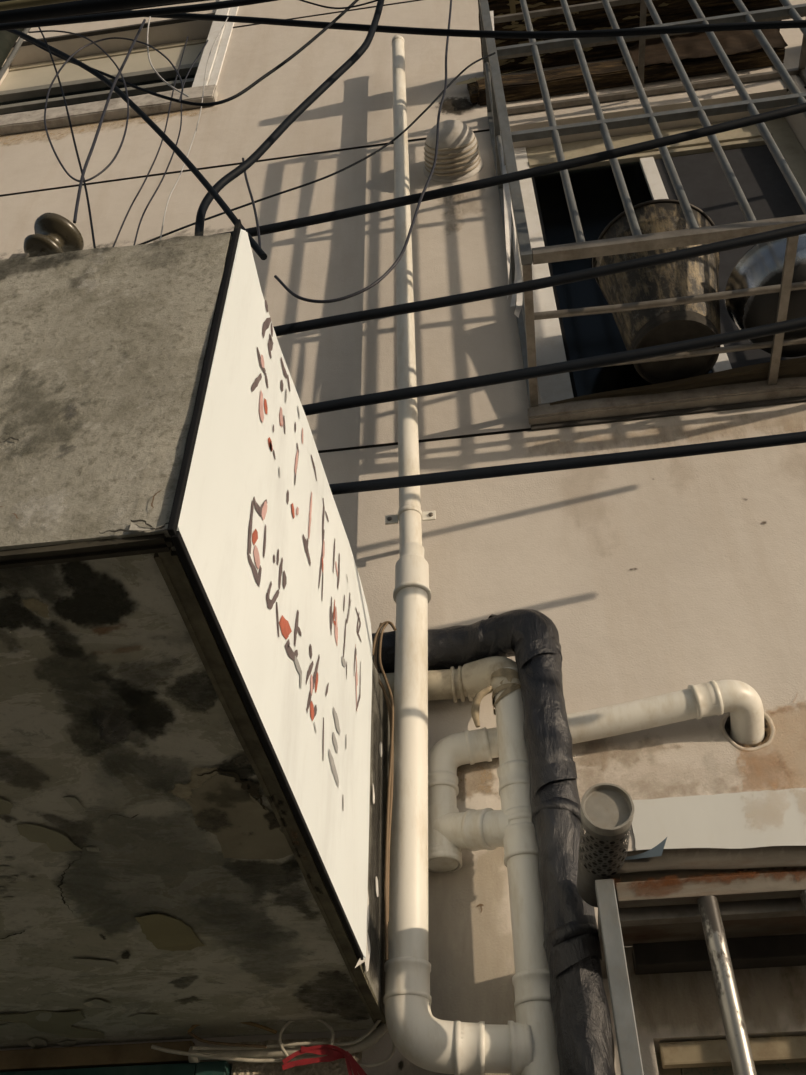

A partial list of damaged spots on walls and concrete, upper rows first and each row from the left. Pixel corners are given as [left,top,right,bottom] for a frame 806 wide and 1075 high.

leakage [0,561,218,756]
peeling [171,768,301,860]
leakage [224,858,317,918]